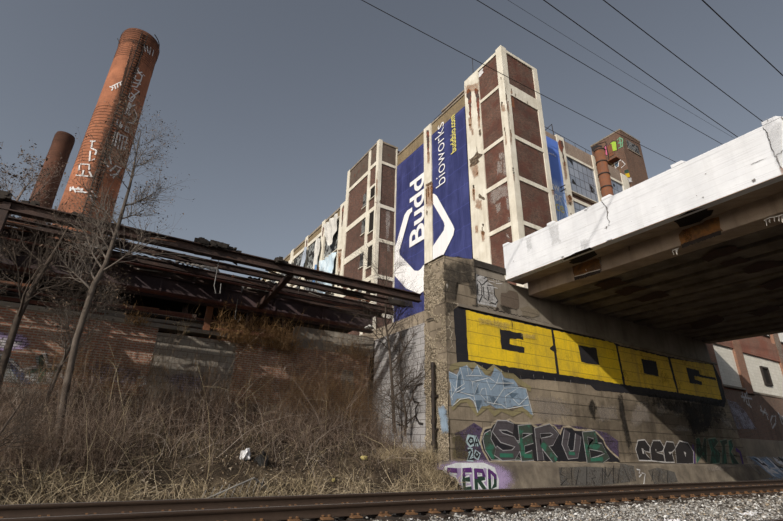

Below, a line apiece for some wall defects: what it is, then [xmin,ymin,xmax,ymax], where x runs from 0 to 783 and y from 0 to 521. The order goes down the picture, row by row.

crack [751,128,783,172]
spalling [674,195,713,227]
spalling [562,247,597,264]